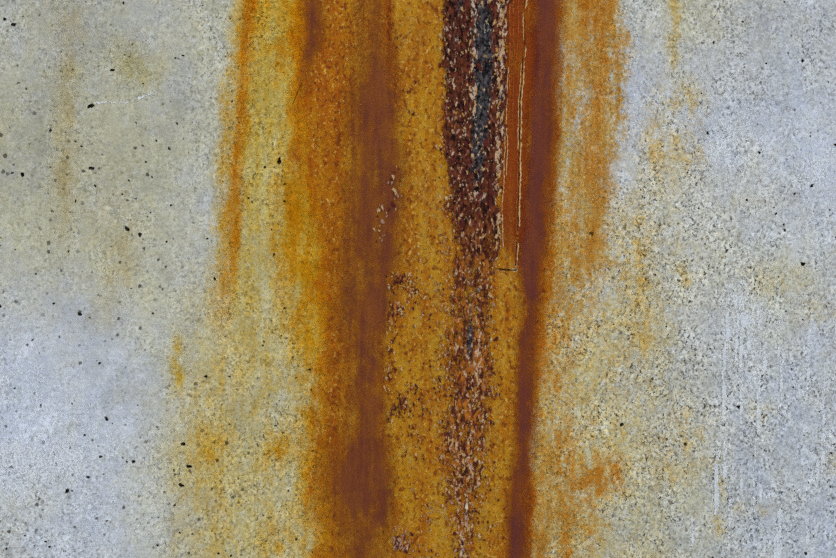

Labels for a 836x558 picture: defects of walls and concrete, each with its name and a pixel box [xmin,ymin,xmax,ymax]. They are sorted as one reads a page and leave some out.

rust [291,0,628,558]